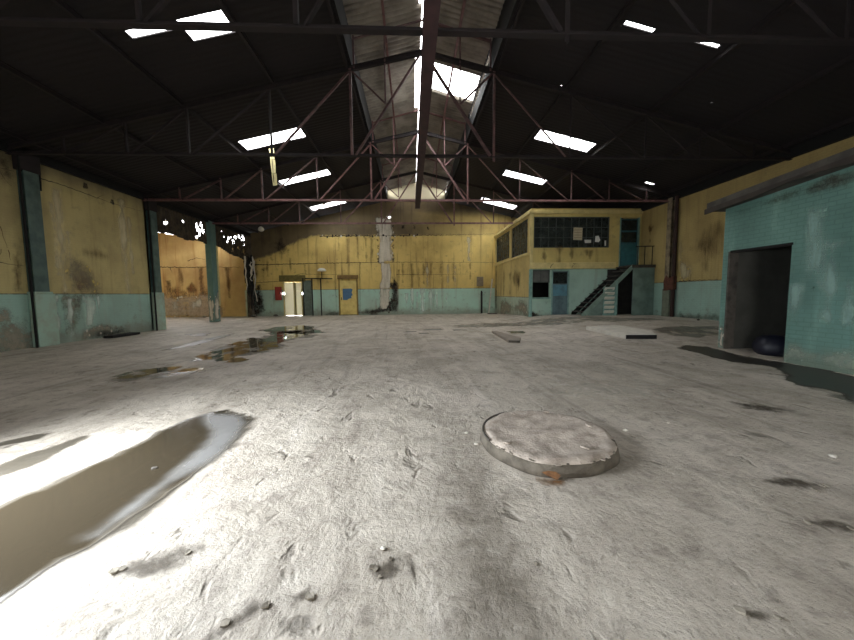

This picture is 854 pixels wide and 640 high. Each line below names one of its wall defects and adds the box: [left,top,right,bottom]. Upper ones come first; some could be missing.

peeling [164,294,222,321]
peeling [376,215,397,313]